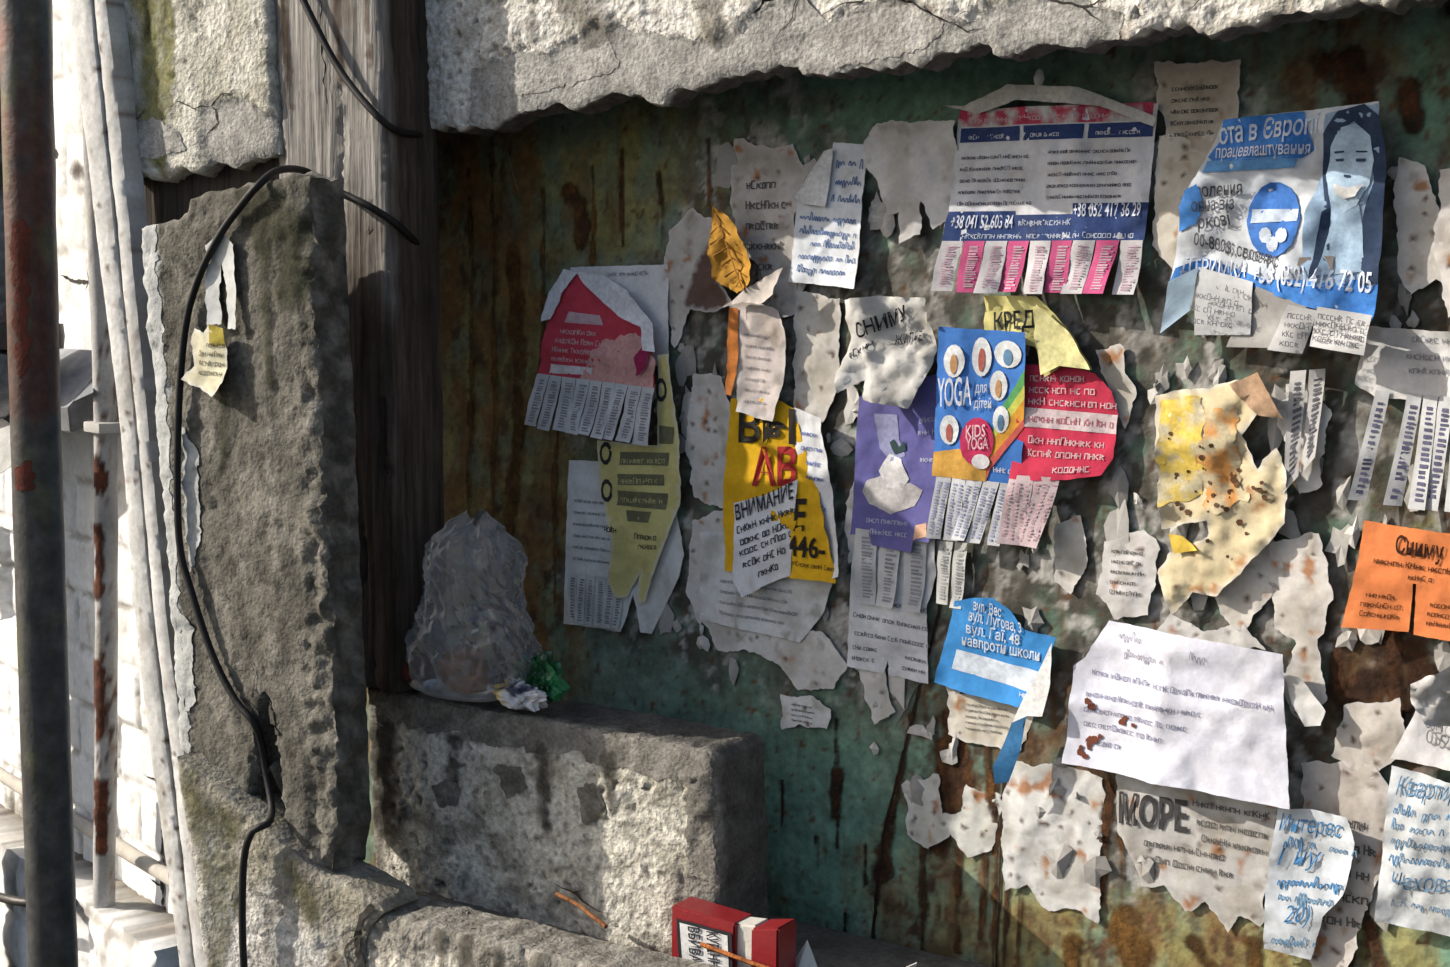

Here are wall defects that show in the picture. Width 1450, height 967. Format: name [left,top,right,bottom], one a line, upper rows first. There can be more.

spalling [469,0,1124,129]
crack [740,0,986,45]
crack [1049,0,1100,21]
peeling [9,219,33,387]
peeling [14,460,36,491]
rust [1329,630,1439,718]
water stain [368,722,401,839]
water stain [534,742,551,832]
rust [863,709,1022,967]
rust [1099,778,1151,967]
crack [344,903,375,967]
water stain [433,927,472,967]